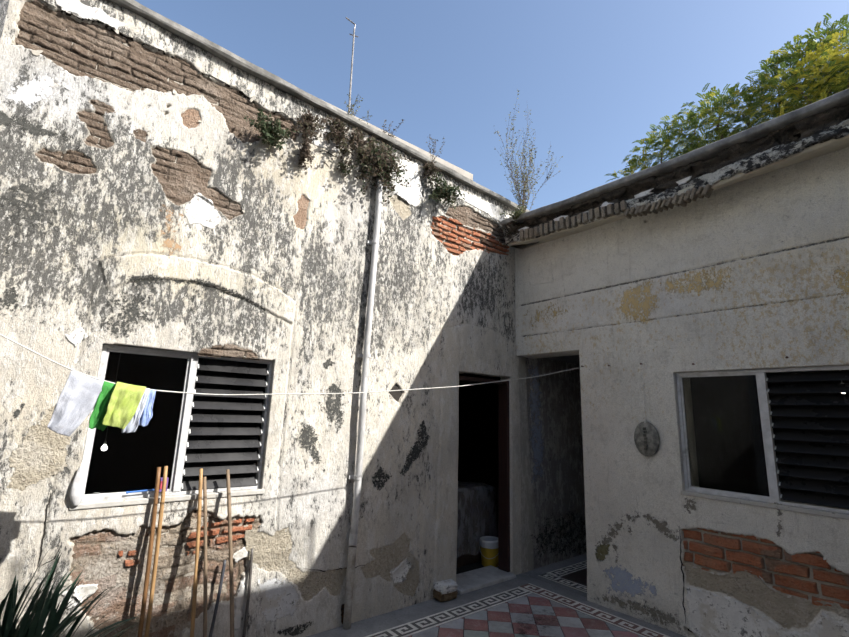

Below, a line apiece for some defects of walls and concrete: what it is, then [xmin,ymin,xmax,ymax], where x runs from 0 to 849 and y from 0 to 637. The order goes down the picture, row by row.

peeling [15,0,299,143]
damp [0,110,82,152]
peeling [35,100,116,174]
peeling [133,129,245,229]
flaking render [431,191,511,256]
damp [0,286,25,320]
damp [99,270,254,339]
damp [319,383,349,434]
damp [297,422,325,471]
crack [37,493,60,567]
spalling [62,510,347,637]
flaking render [682,528,849,637]